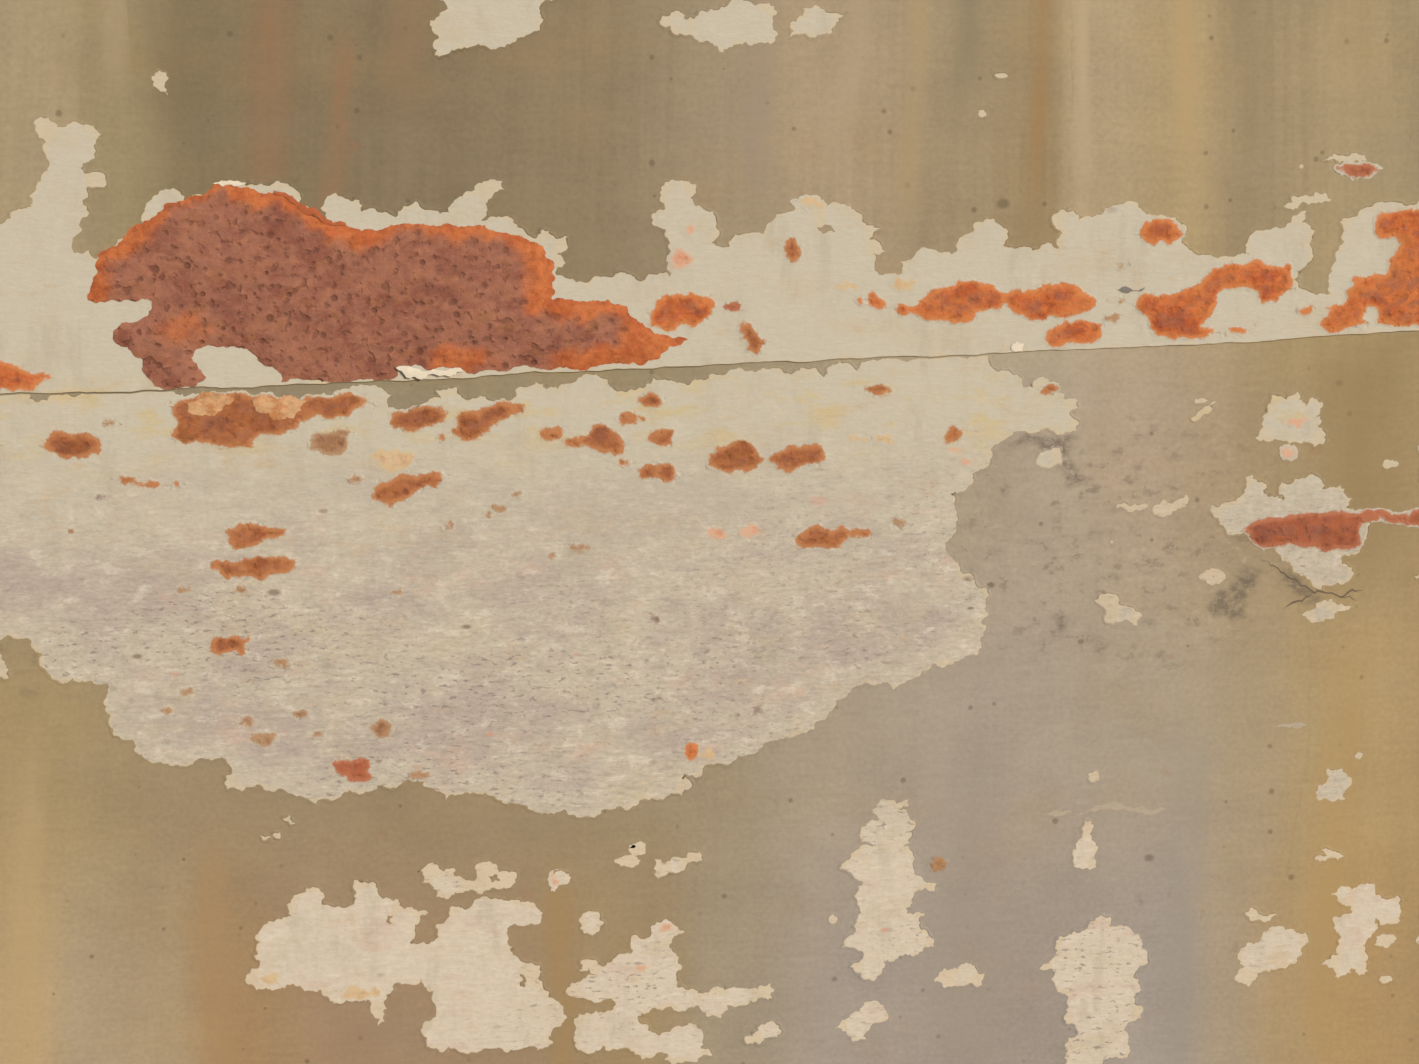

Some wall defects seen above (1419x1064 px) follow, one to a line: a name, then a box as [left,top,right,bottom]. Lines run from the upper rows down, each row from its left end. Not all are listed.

peeling [427,0,558,60]
rust [87,0,767,508]
rust [852,205,1419,350]
rust [36,417,122,461]
rust [206,519,300,596]
peeling [0,113,1419,844]
rust [705,436,828,476]
rust [1241,507,1419,553]
peeling [243,858,786,1064]
peeling [825,796,939,1045]
peeling [1037,912,1152,1064]
peeling [1318,879,1419,986]